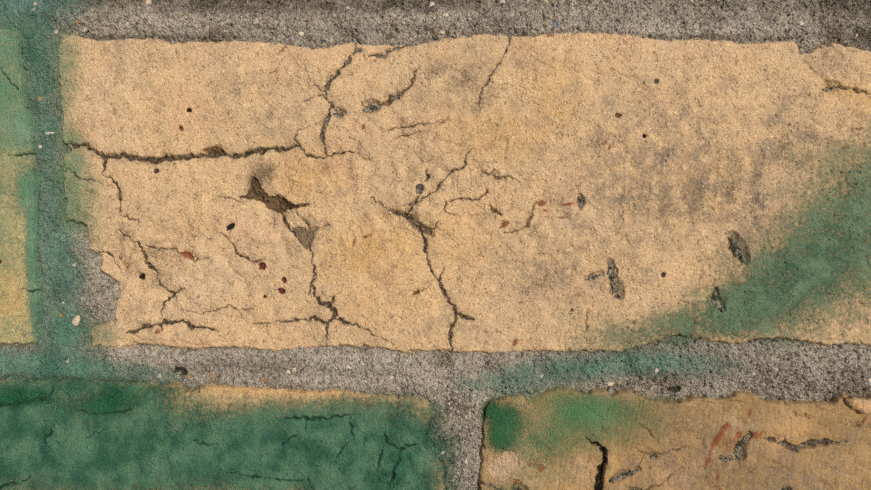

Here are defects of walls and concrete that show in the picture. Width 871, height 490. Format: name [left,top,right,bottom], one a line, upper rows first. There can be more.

crack [362,69,418,113]
crack [478,36,510,108]
crack [388,120,445,142]
crack [63,42,408,347]
crack [371,148,537,352]
crack [586,437,607,490]
crack [636,424,685,466]